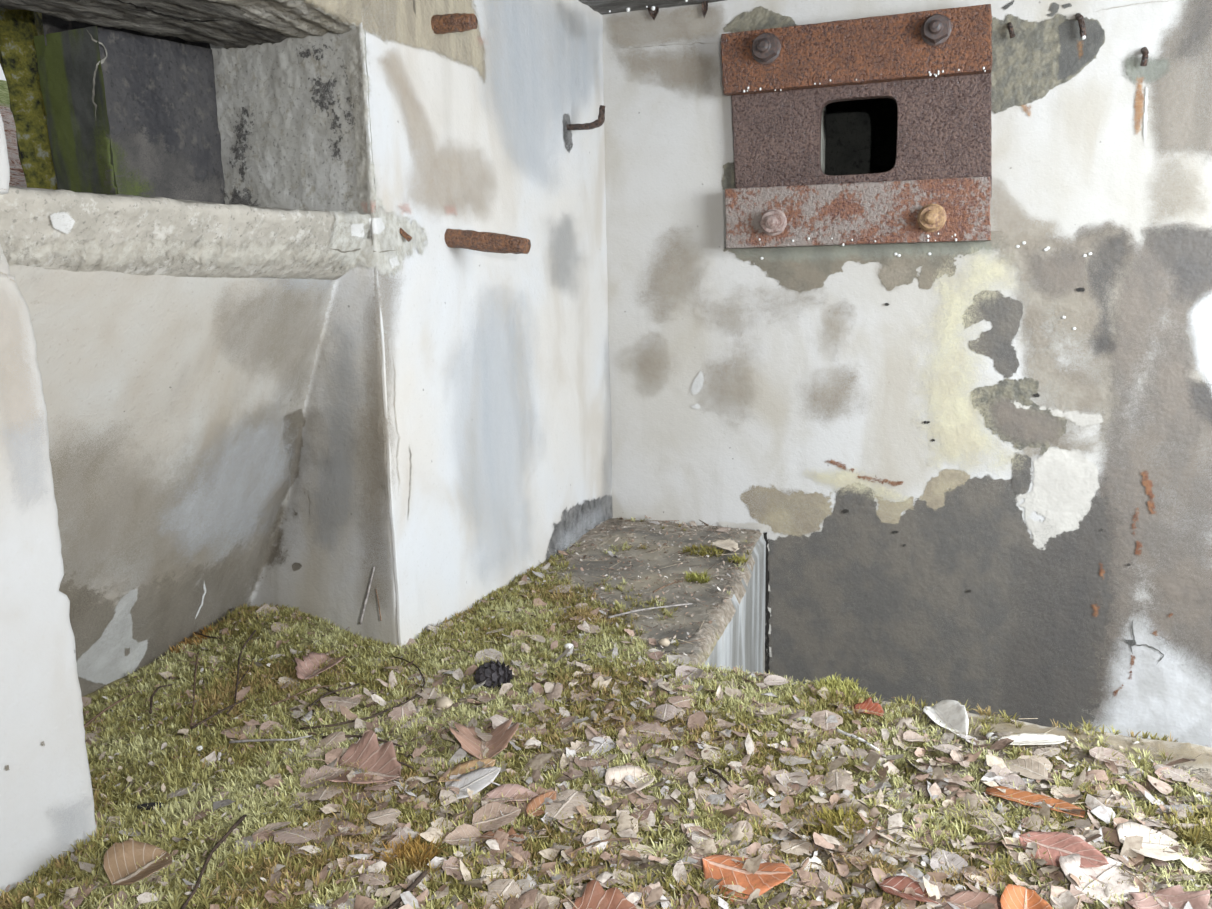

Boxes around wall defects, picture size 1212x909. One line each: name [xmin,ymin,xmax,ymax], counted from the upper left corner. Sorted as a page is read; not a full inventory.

spalling [303,0,488,278]
spalling [991,0,1105,114]
rust [1133,76,1149,146]
leakage [541,0,1212,730]